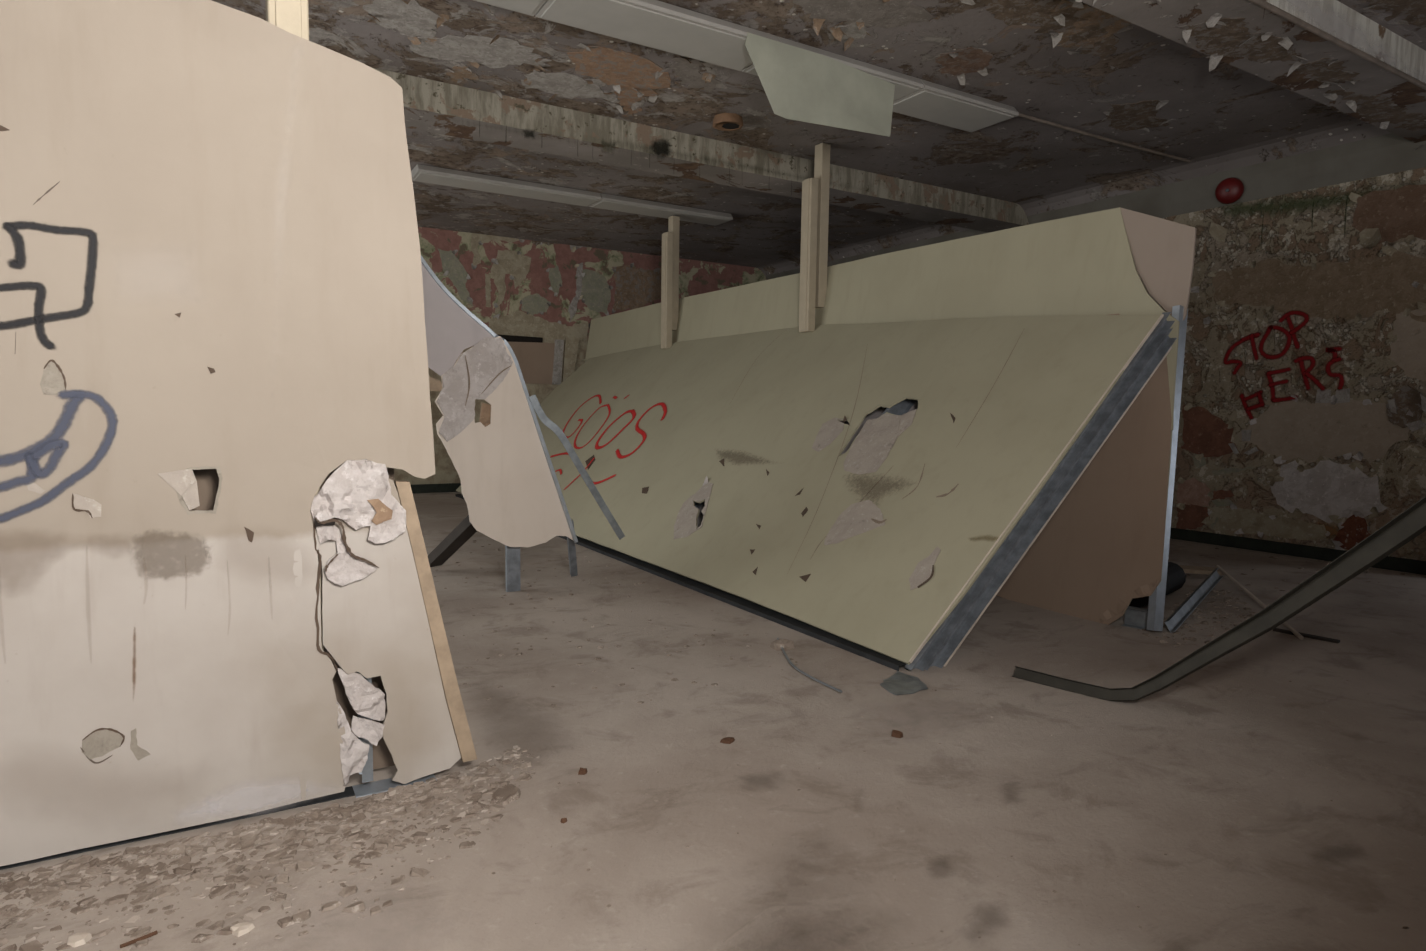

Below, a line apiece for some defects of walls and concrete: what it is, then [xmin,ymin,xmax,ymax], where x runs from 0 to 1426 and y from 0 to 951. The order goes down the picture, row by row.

peeling [363,0,724,122]
peeling [793,0,941,51]
peeling [936,47,993,85]
peeling [960,0,1133,59]
peeling [1172,13,1426,131]
peeling [1101,100,1176,132]
peeling [1349,184,1426,250]
peeling [437,233,592,343]
peeling [612,263,662,313]
spalling [1169,302,1426,540]
crack [314,517,379,670]